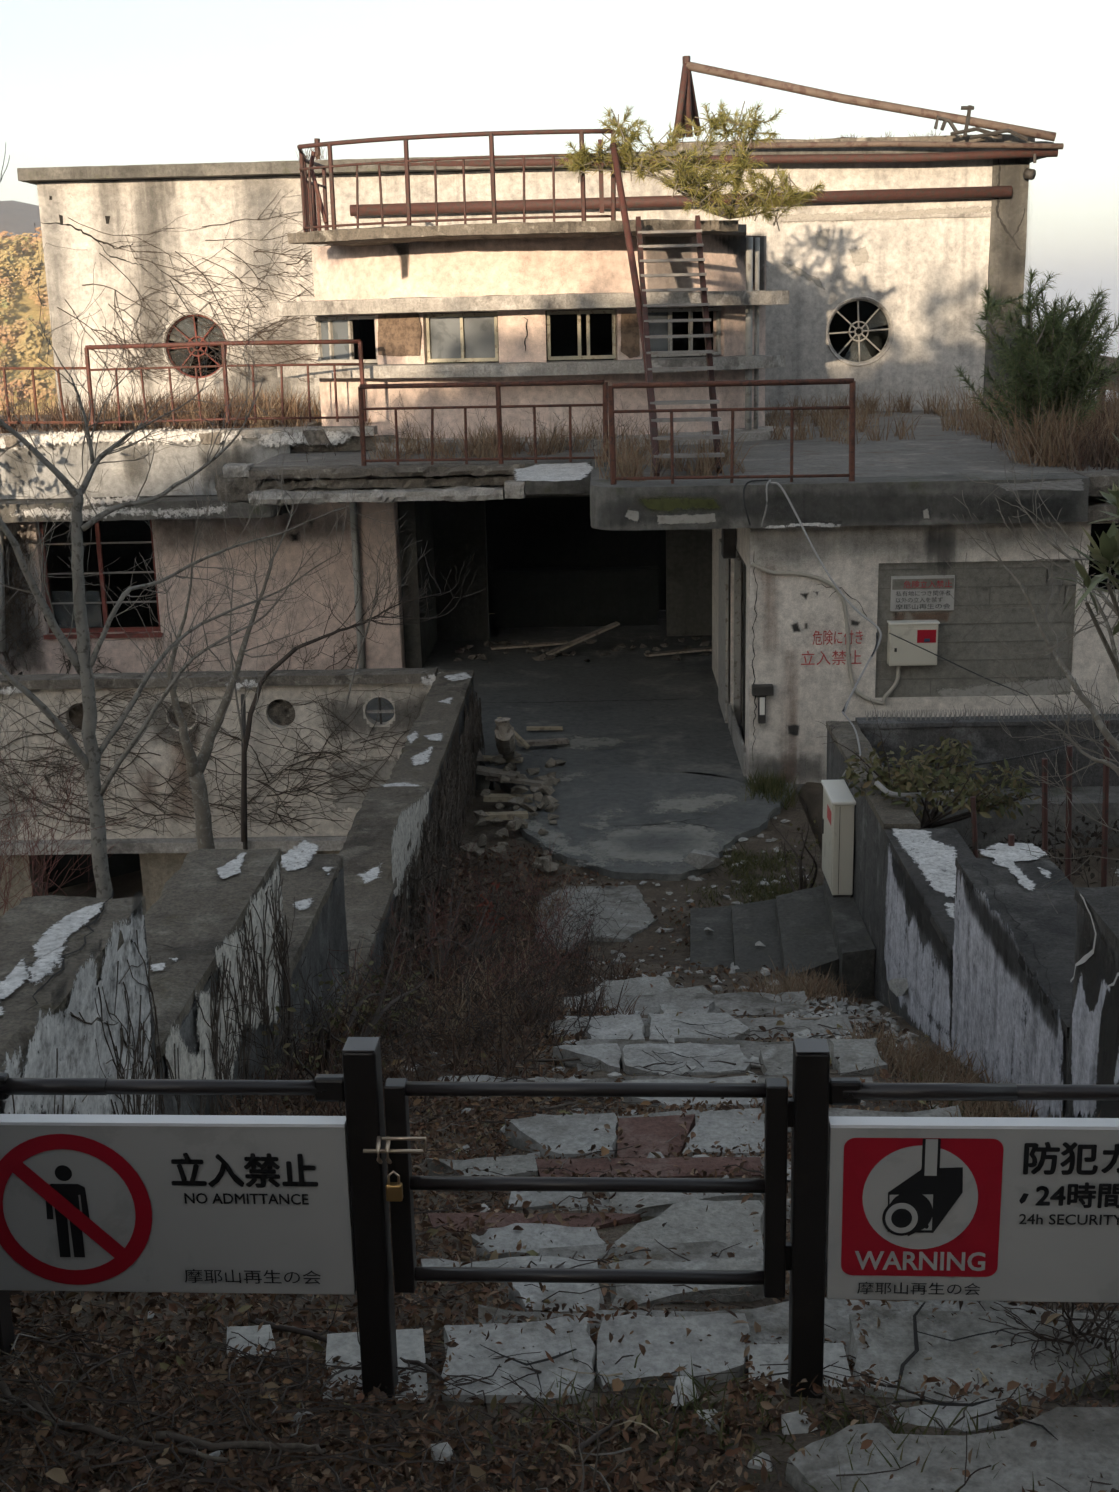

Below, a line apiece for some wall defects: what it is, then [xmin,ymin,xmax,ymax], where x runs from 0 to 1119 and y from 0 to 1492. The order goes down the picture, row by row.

peeling [514,462,593,481]
leakage [894,857,951,974]
leakage [962,873,1058,1038]